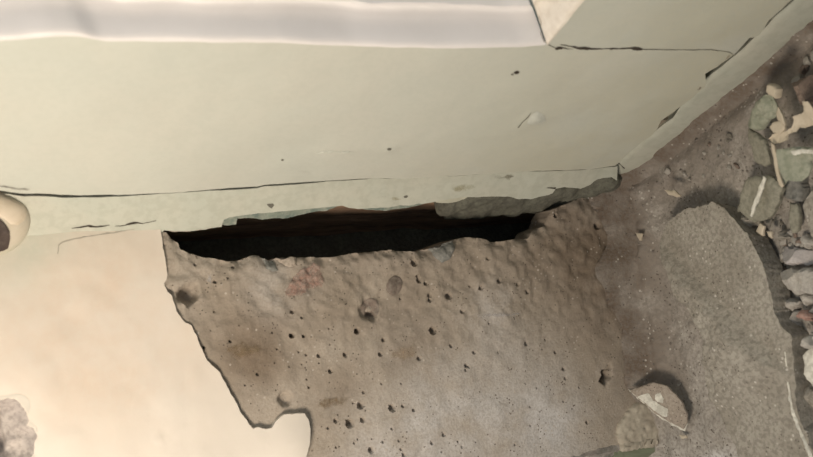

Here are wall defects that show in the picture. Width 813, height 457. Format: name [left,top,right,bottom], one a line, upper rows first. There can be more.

crack [539,17,671,51]
peeling [0,191,28,252]
flaking render [161,173,688,457]